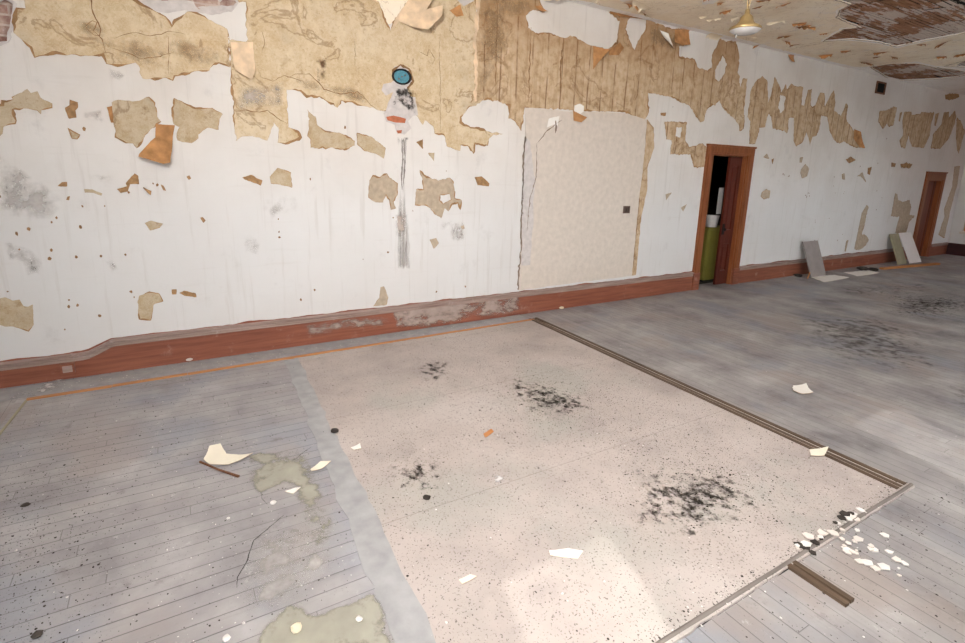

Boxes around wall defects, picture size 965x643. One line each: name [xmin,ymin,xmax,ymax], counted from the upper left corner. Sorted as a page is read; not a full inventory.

peeling [581,0,965,81]
peeling [0,89,52,136]
peeling [107,97,223,164]
peeling [307,111,386,158]
spalling [382,64,434,161]
peeling [661,113,706,168]
peeling [878,93,965,154]
peeling [242,168,292,188]
peeling [368,173,398,218]
peeling [412,170,462,218]
leakage [250,453,330,543]
leakage [260,595,389,643]